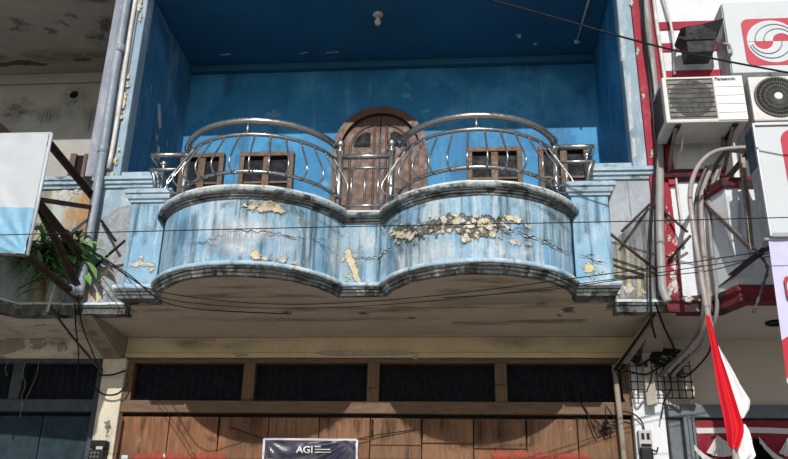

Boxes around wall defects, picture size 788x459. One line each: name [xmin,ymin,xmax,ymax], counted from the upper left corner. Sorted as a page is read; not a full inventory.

peeling [239,200,286,214]
peeling [87,204,156,303]
spalling [249,249,299,266]
crack [188,229,396,263]
peeling [341,247,362,282]
spalling [389,212,533,248]
crack [493,227,607,264]
peeling [582,262,604,281]
peeling [612,208,701,302]